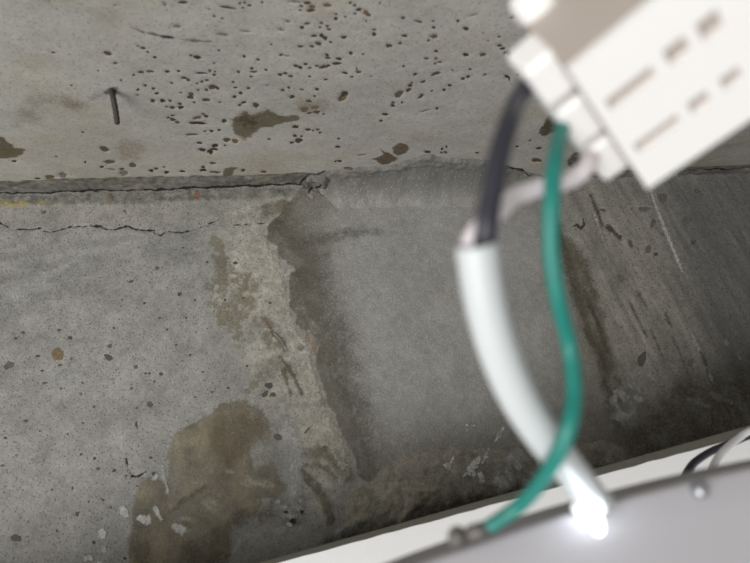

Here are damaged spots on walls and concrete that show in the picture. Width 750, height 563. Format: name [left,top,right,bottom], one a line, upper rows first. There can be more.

water stain [0,137,24,158]
crack [0,171,325,194]
crack [0,221,215,236]
water stain [129,360,292,563]